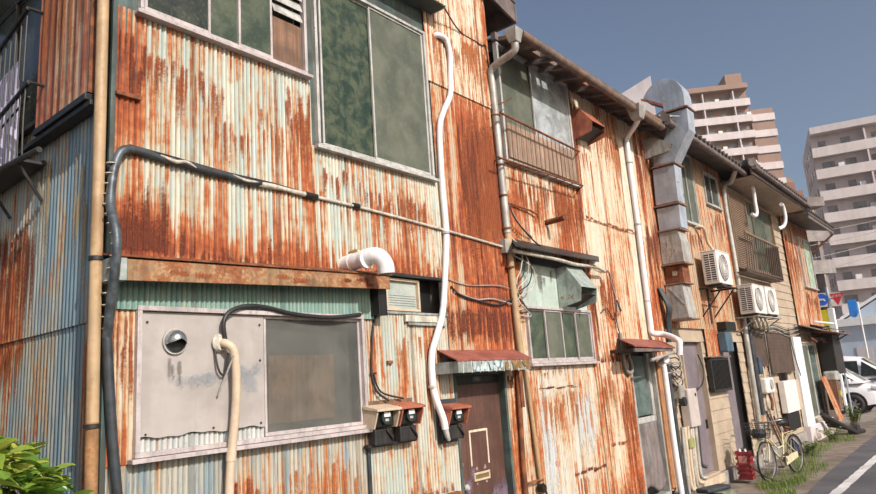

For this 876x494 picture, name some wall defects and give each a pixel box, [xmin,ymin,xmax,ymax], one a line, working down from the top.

rust [0,223,35,326]
rust [119,29,249,162]
rust [122,182,374,287]
rust [258,86,311,179]
rust [323,167,428,239]
rust [396,332,437,374]
rust [447,306,512,344]
rust [457,102,634,259]
rust [528,367,583,484]
rust [575,274,645,494]
rust [645,223,661,297]
rust [234,478,260,494]